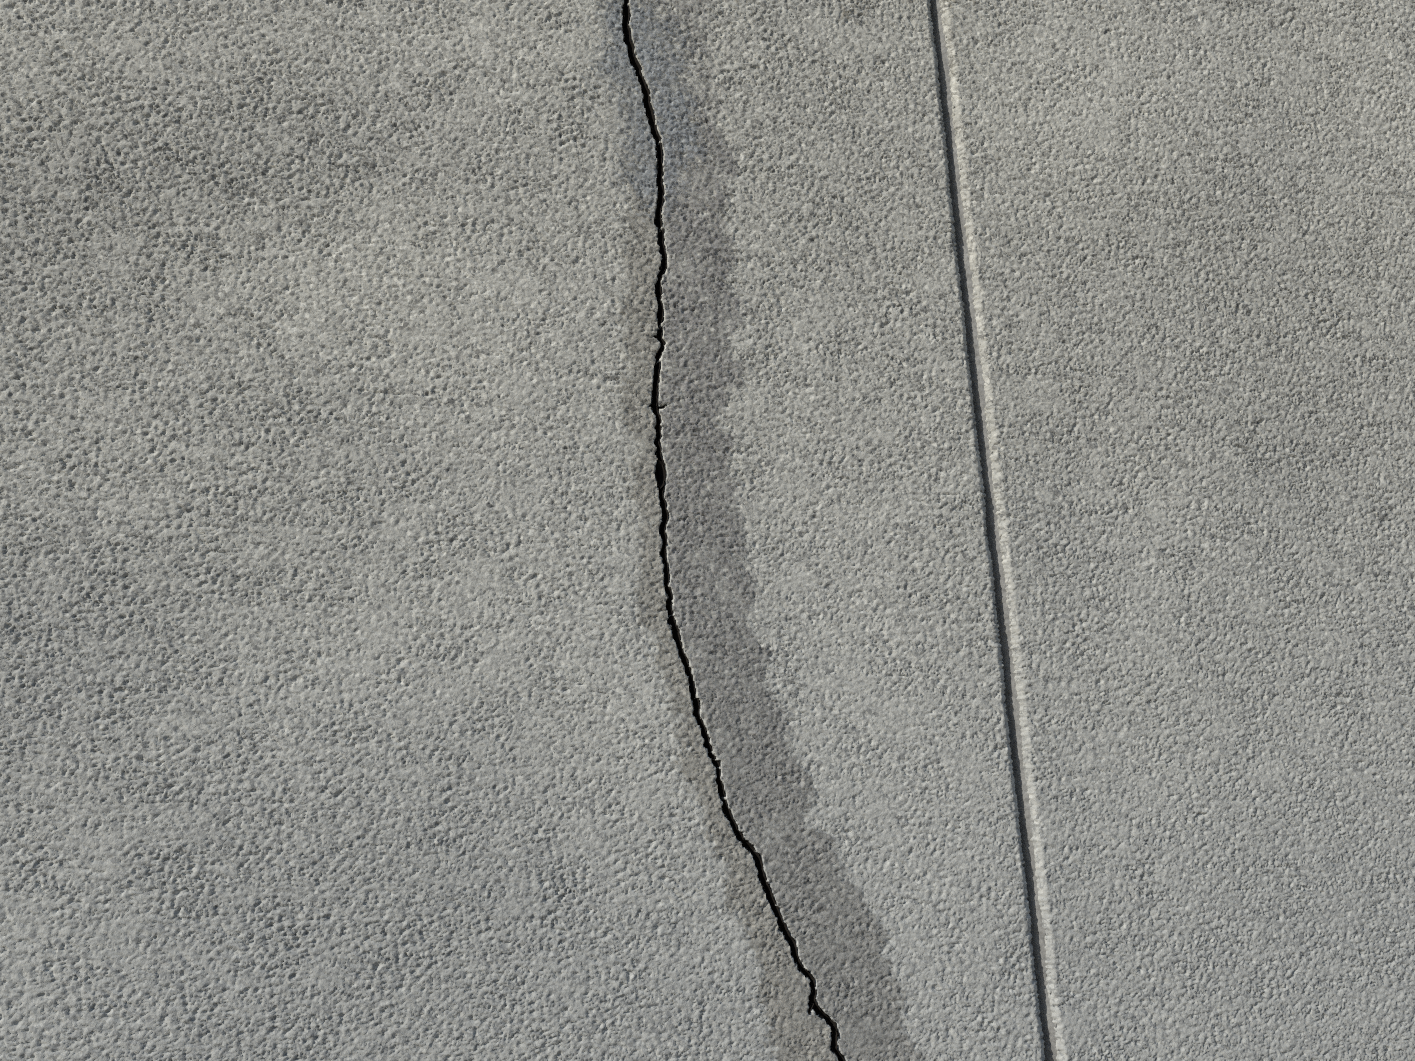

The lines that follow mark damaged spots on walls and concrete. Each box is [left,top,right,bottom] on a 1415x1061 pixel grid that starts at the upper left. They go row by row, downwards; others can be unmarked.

crack [623,0,845,1061]
damp [598,0,924,1061]